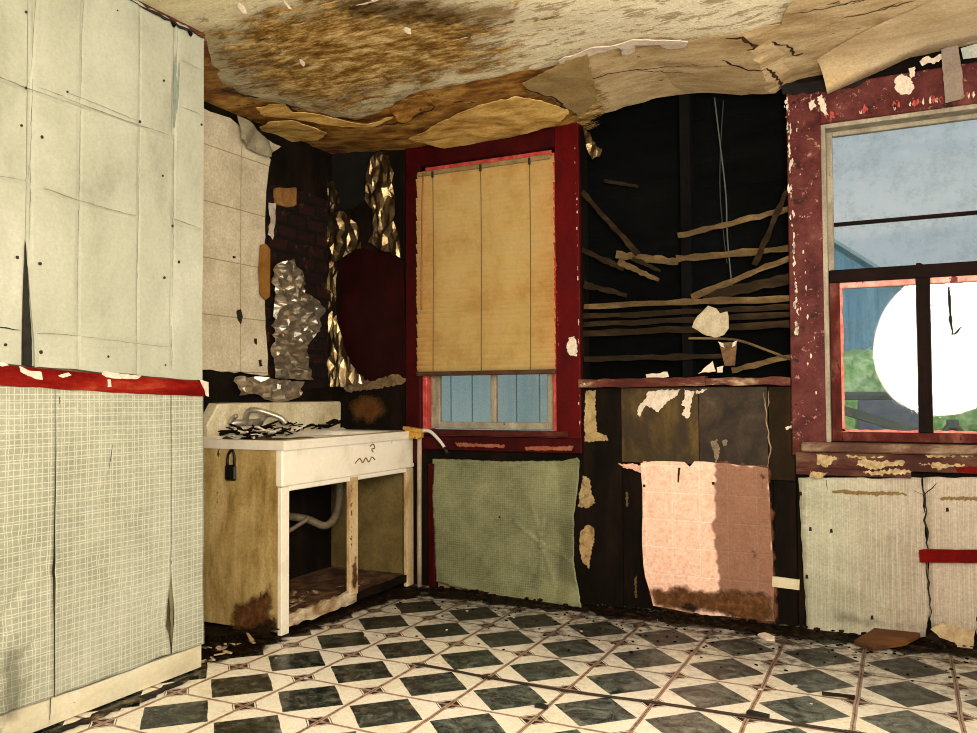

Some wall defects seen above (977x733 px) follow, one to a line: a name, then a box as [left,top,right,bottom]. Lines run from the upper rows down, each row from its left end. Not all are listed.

water stain [200,0,531,114]
peeling [781,0,977,197]
crack [0,0,205,286]
peeling [789,210,809,335]
peeling [0,362,43,380]
crack [0,322,172,375]
peeling [102,371,141,387]
peeling [681,389,706,418]
peeling [809,454,977,479]